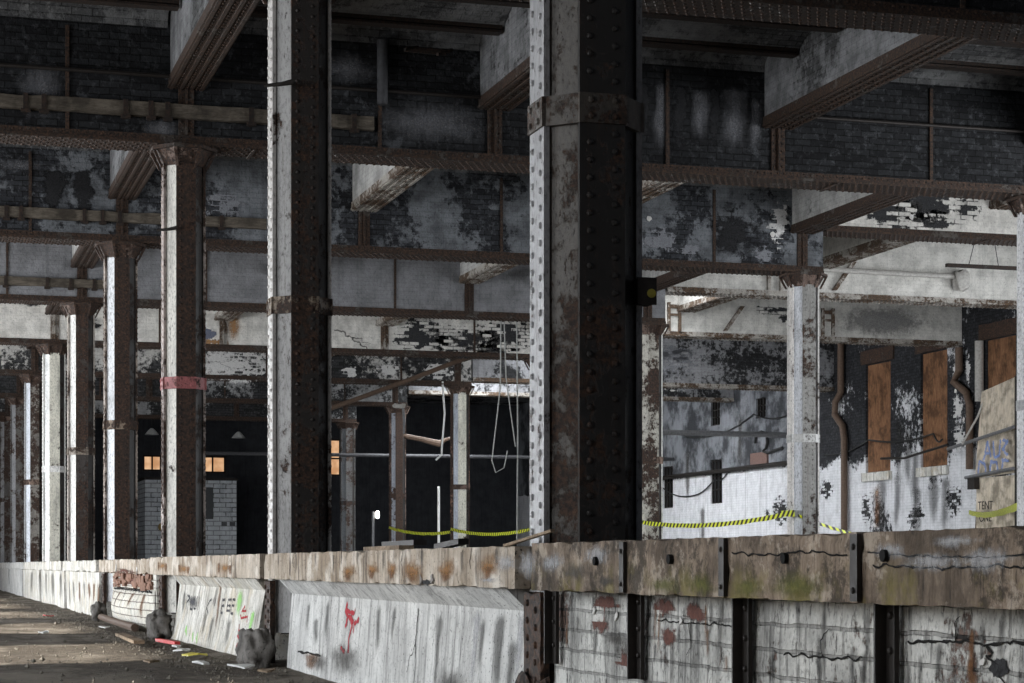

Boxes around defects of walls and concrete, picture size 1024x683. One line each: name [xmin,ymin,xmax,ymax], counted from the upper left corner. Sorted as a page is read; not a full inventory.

water stain [642,84,760,150]
peeling [867,196,982,230]
peeling [392,318,530,379]
peeling [820,480,834,500]
peeling [946,486,962,518]
rust [369,565,418,581]
rust [439,563,453,581]
rust [481,559,495,578]
crack [731,549,1024,571]
crack [783,629,862,662]
crack [907,616,1024,683]
spalling [979,658,1009,678]